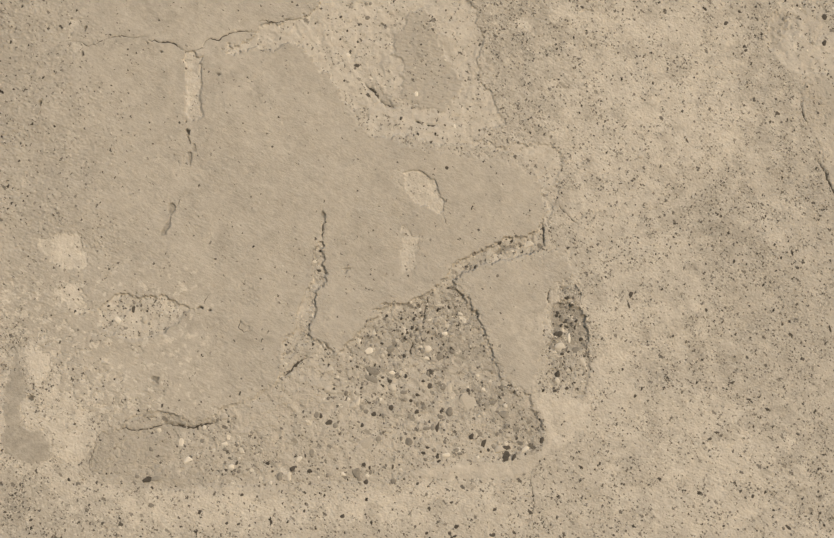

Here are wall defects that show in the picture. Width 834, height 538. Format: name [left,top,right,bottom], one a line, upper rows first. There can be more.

crack [198,19,289,50]
flaking render [763,0,834,76]
spalling [21,0,564,491]
spalling [544,282,592,398]